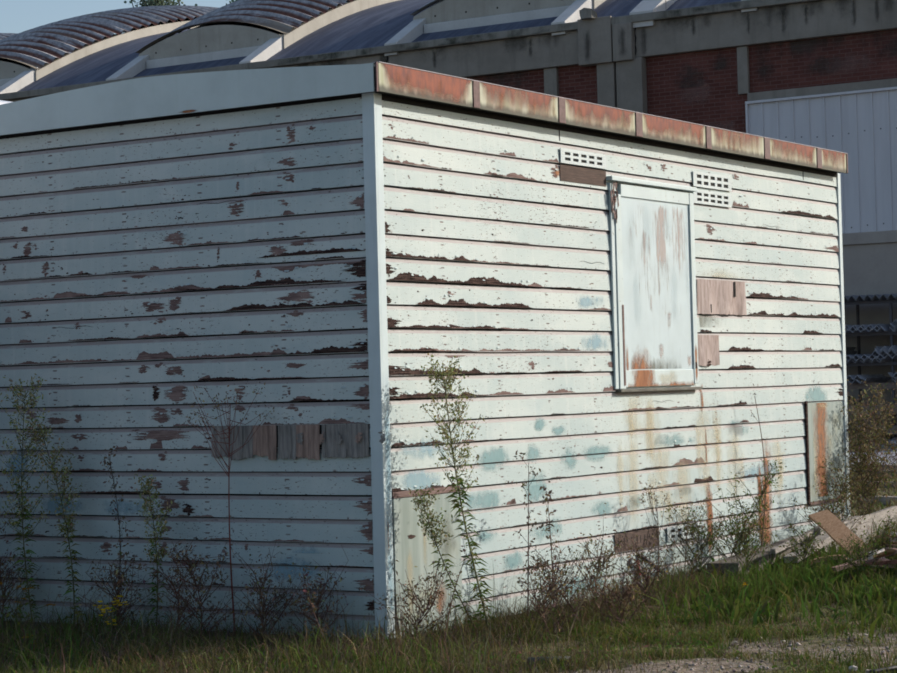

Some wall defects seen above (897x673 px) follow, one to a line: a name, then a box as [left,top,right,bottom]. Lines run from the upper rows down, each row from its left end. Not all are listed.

corrosion [382,63,471,101]
corrosion [482,83,555,111]
corrosion [566,99,759,145]
peeling [485,155,606,187]
peeling [697,272,754,323]
peeling [0,211,373,570]
peeling [390,342,608,395]
peeling [588,305,626,391]
corrosion [627,349,704,410]
corrosion [816,403,828,497]
corrosion [752,458,770,543]
peeling [614,520,693,553]